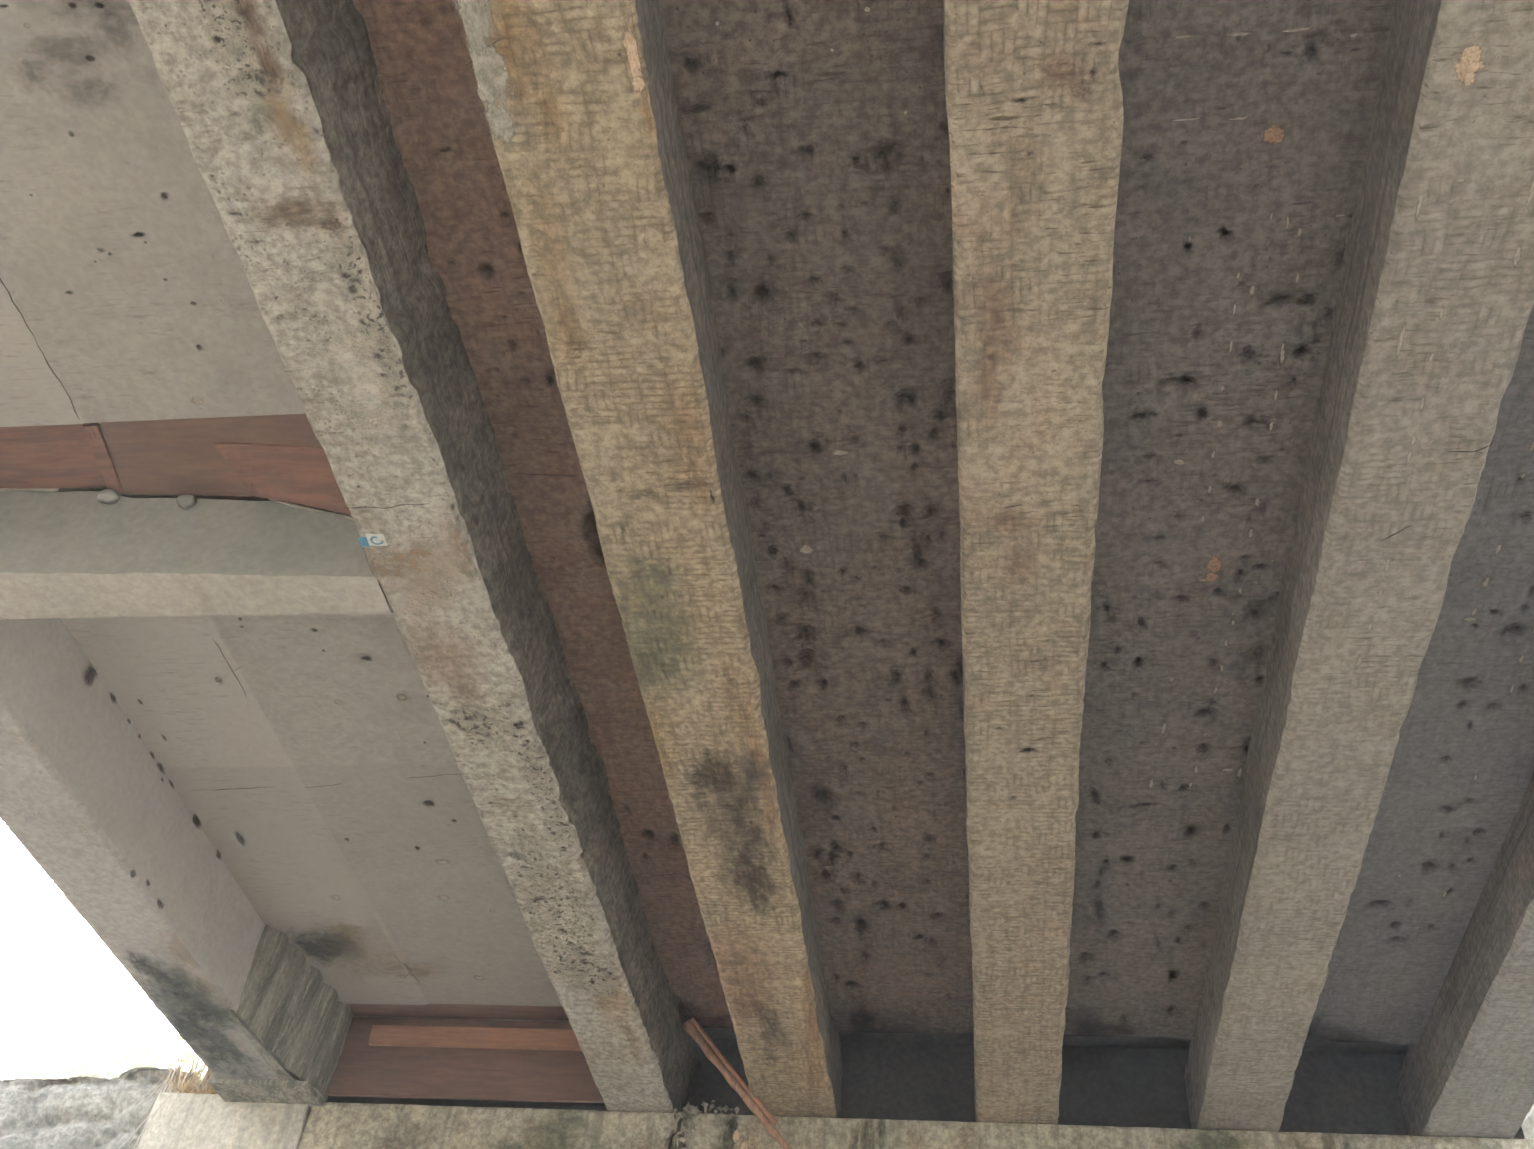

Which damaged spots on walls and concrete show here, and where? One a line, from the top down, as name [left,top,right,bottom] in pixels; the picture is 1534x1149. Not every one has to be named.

water stain [692,759,771,908]
water stain [129,954,251,1076]
crack [669,1117,686,1149]